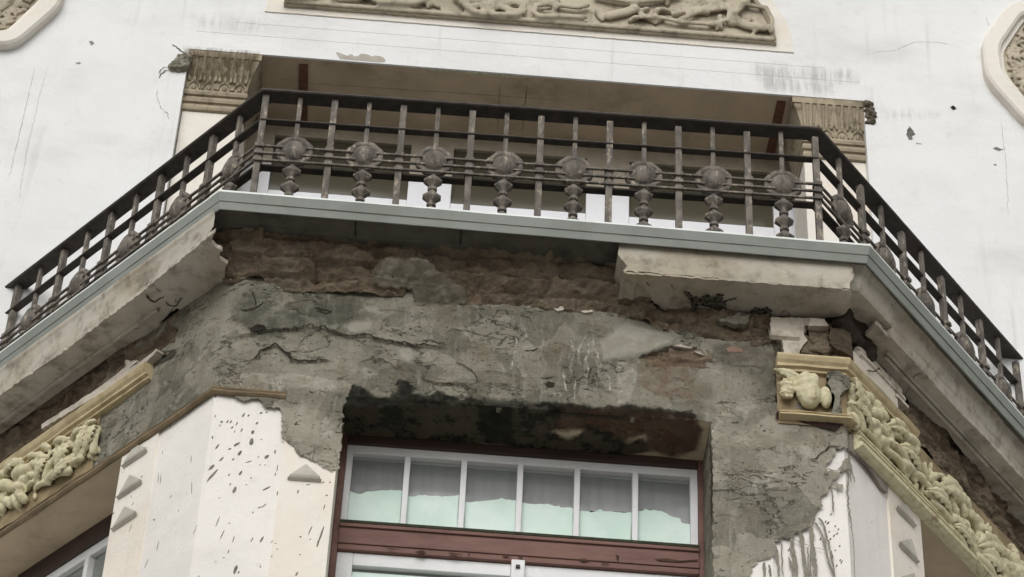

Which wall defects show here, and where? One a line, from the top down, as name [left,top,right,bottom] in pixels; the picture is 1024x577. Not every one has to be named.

peeling [336,53,386,62]
crack [136,280,182,329]
spalling [212,227,775,370]
crack [225,292,552,388]
spalling [800,308,877,362]
water stain [342,322,702,456]
spalling [797,370,850,430]